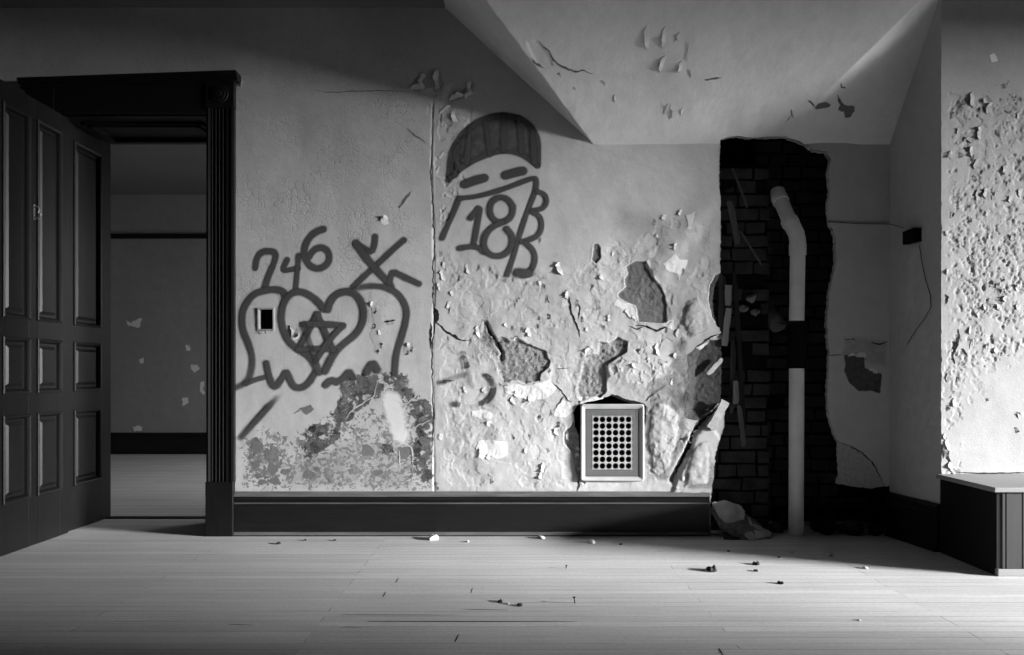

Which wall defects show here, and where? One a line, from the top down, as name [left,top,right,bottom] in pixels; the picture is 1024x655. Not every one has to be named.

crack [532,42,592,77]
peeling [644,26,691,77]
peeling [411,70,476,129]
spalling [808,84,855,118]
peeling [943,92,1023,217]
peeling [437,251,480,313]
peeling [968,278,1021,356]
spalling [472,243,722,483]
spalling [844,352,882,393]
water stain [241,372,435,490]
crack [838,441,884,485]
peeling [943,434,959,474]